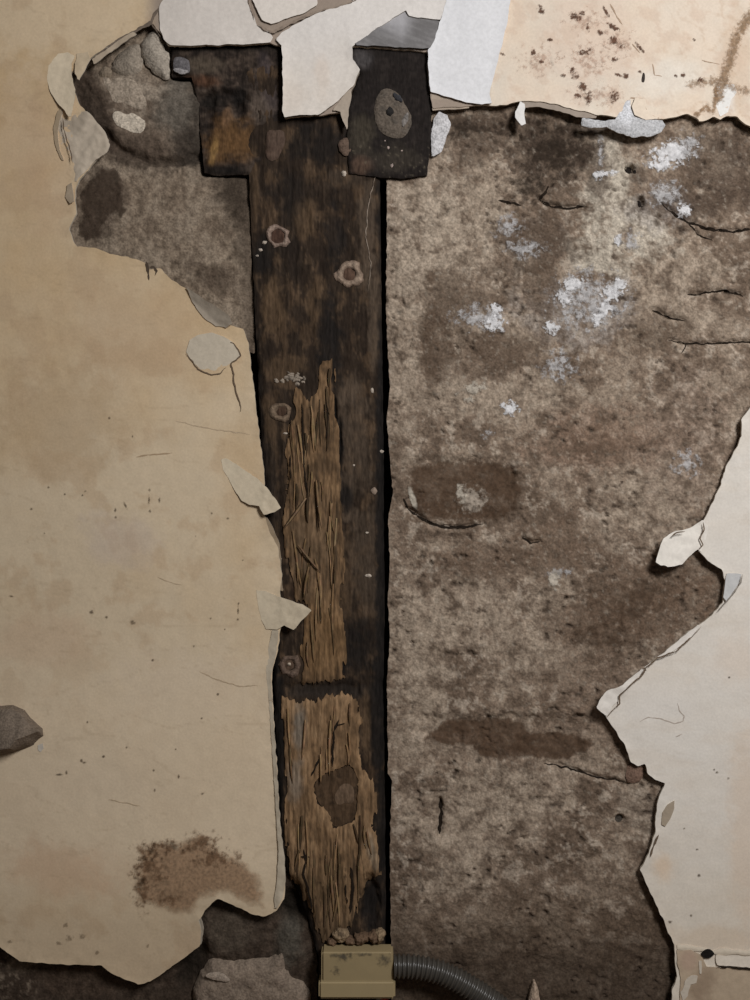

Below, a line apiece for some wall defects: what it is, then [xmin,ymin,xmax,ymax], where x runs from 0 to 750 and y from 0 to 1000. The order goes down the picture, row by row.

flaking render [70,25,257,412]
crack [499,186,584,209]
efflorescence [648,137,699,218]
crack [660,201,750,241]
efflorescence [455,302,508,332]
efflorescence [544,265,630,336]
crack [652,310,750,352]
crack [403,498,481,529]
flaking render [385,102,750,1000]
damp [431,718,591,761]
damp [134,836,260,909]
flaking render [0,861,319,1000]